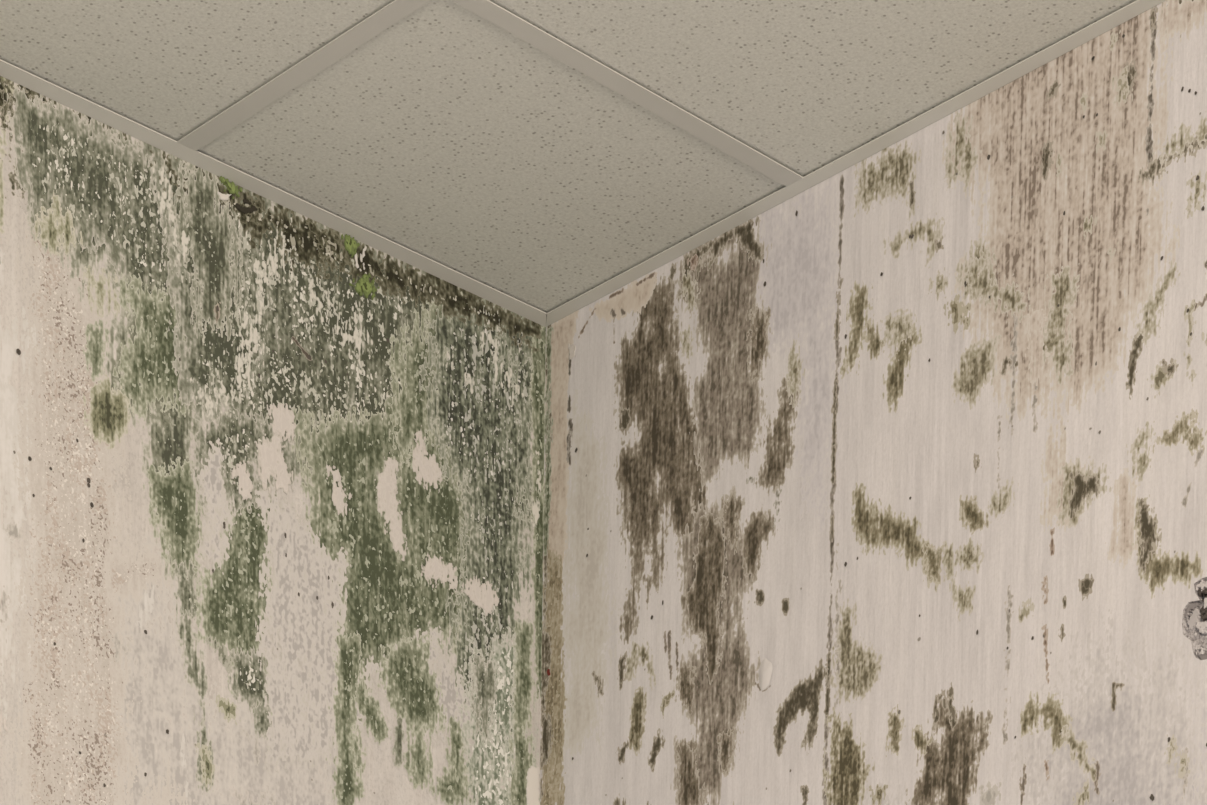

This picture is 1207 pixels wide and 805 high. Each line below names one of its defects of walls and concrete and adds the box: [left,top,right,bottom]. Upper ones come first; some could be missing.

damp [943,110,982,193]
damp [1112,60,1138,106]
mould [1138,111,1207,219]
damp [1150,0,1207,43]
damp [0,76,553,529]
damp [1126,260,1207,400]
damp [0,247,44,721]
damp [450,140,1080,805]
damp [1056,456,1113,528]
damp [1126,408,1207,608]
damp [91,526,339,805]
spalling [1182,577,1207,660]